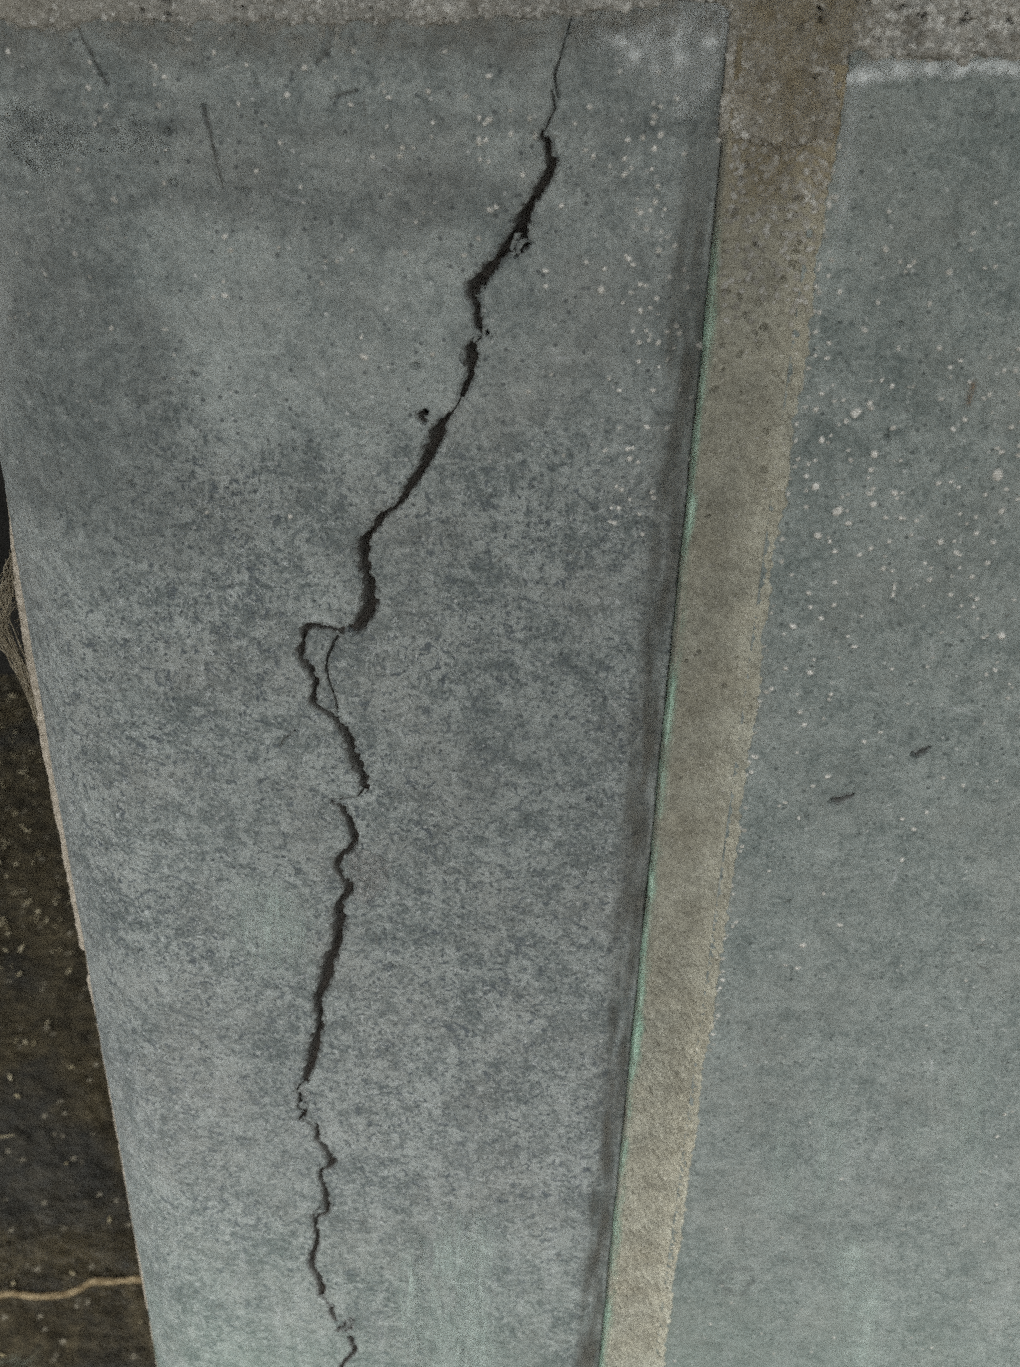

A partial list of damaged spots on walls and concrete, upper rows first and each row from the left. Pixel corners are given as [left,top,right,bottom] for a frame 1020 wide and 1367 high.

crack [278,16,574,1367]